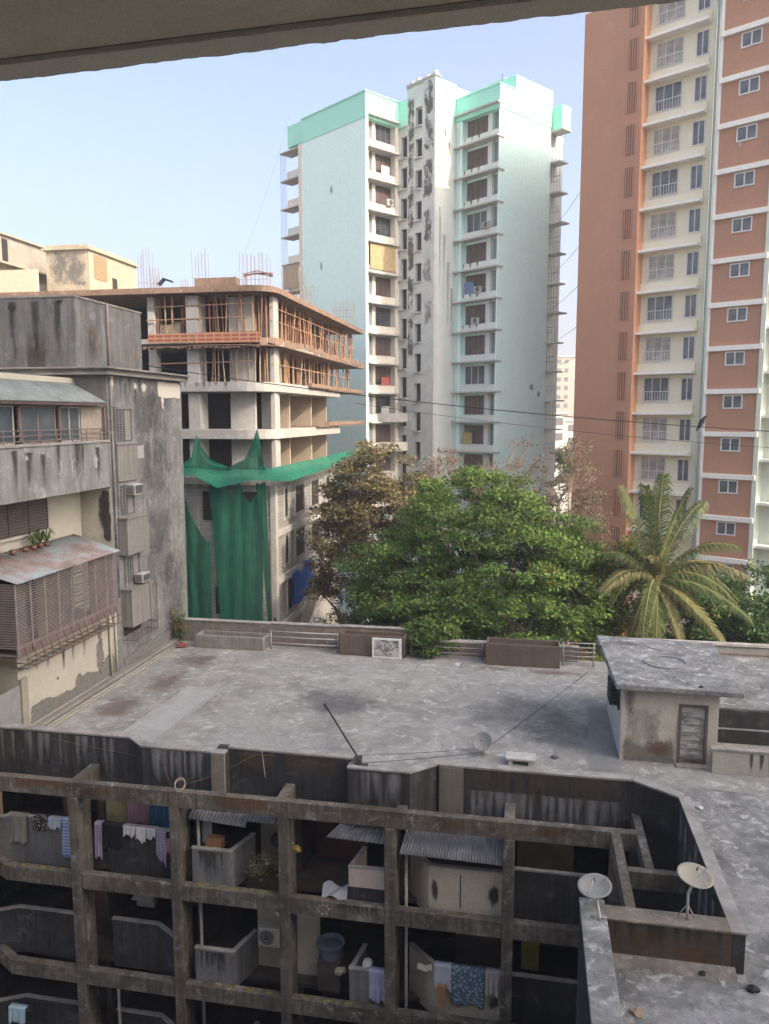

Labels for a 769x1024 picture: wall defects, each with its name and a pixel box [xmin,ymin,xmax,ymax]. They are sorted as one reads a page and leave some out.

leakage [407,80,433,355]
leakage [28,301,45,367]
peeling [134,382,180,413]
leakage [0,625,175,770]
leakage [472,769,553,793]